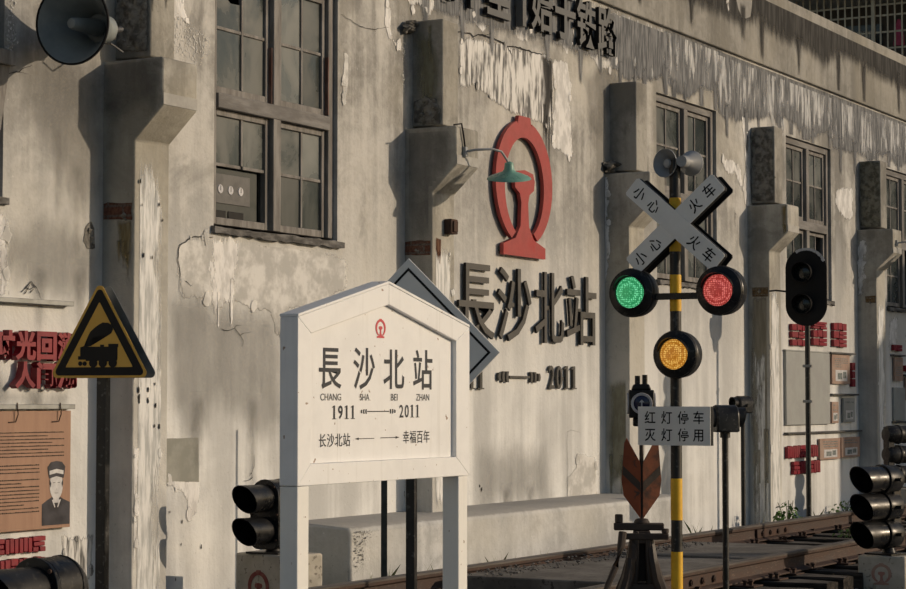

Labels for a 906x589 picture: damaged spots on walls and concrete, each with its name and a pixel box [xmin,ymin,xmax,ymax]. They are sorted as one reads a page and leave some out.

peeling [459,11,577,162]
leakage [416,0,906,173]
spalling [590,3,906,227]
spalling [84,222,95,249]
corrosion [117,222,131,268]
peeling [177,230,347,335]
peeling [103,168,200,589]